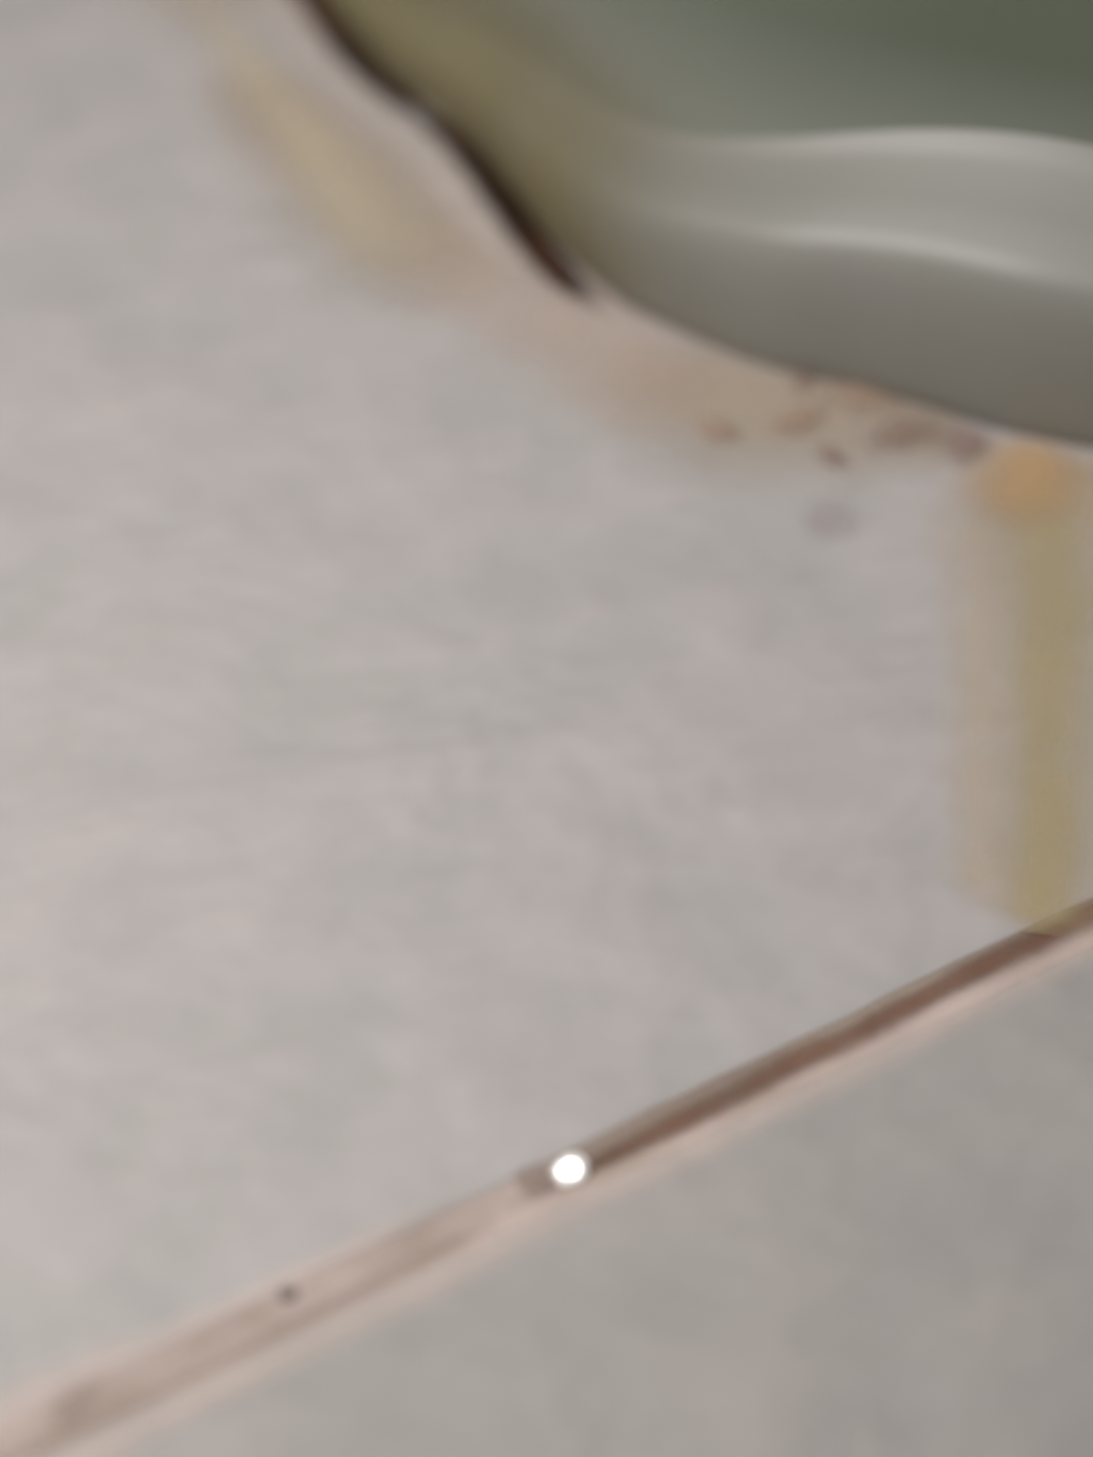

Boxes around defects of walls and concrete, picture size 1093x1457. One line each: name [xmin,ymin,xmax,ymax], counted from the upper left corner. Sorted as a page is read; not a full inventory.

damp [326,0,581,268]